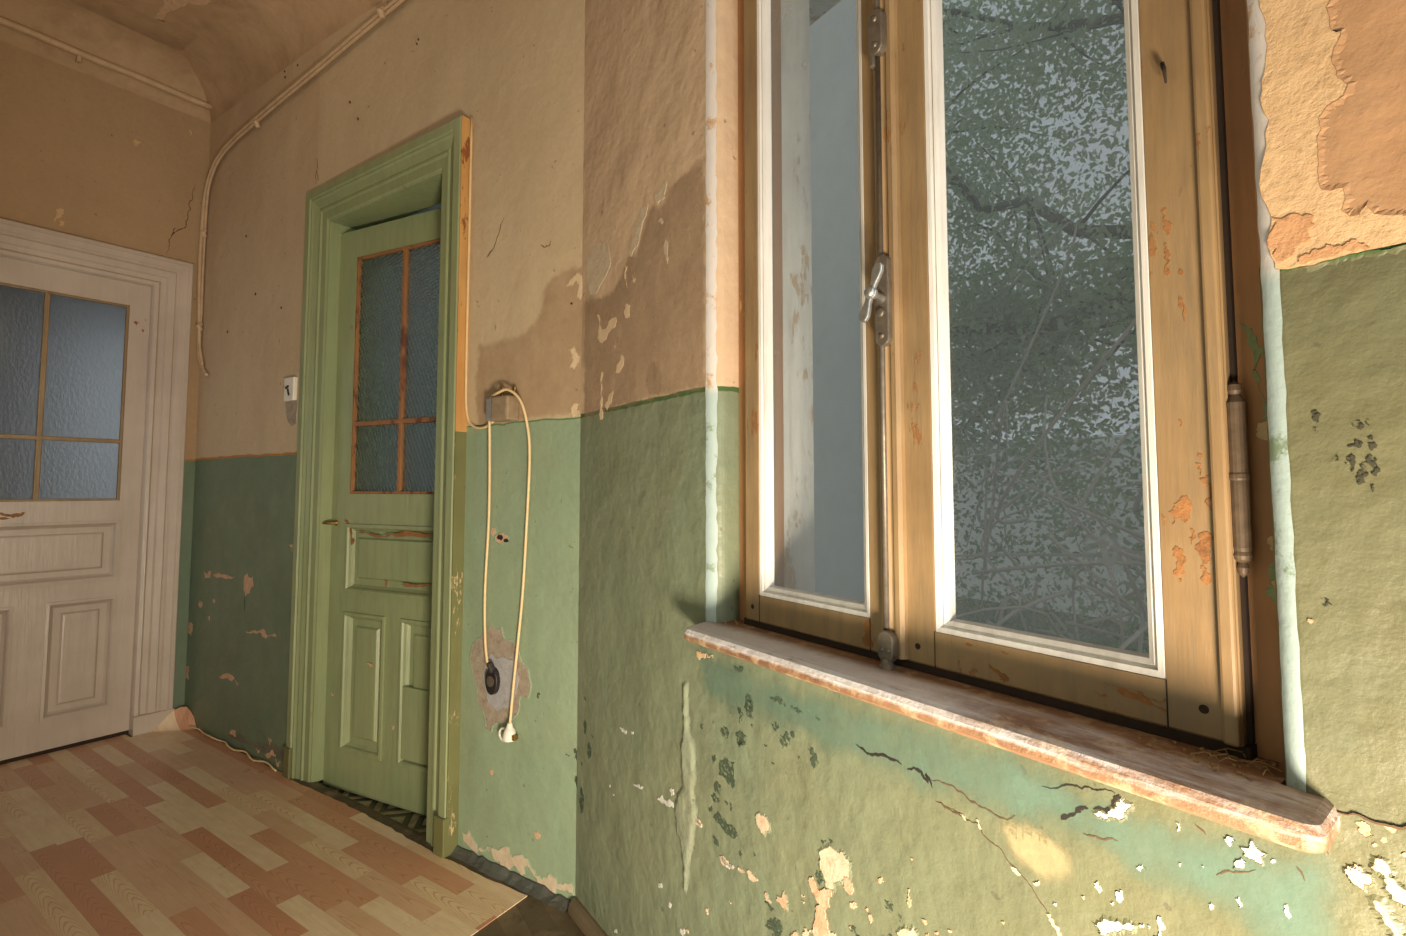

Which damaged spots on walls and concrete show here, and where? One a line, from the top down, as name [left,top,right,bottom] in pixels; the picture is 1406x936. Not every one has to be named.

peeling [1259,0,1406,273]
crack [167,184,195,252]
damp [585,171,703,415]
peeling [204,571,254,596]
spalling [469,622,540,732]
peeling [720,694,754,747]
peeling [764,722,819,770]
spalling [462,831,575,897]
peeling [657,788,674,808]
spalling [695,755,952,936]
crack [1217,868,1255,876]
crack [1337,811,1406,830]